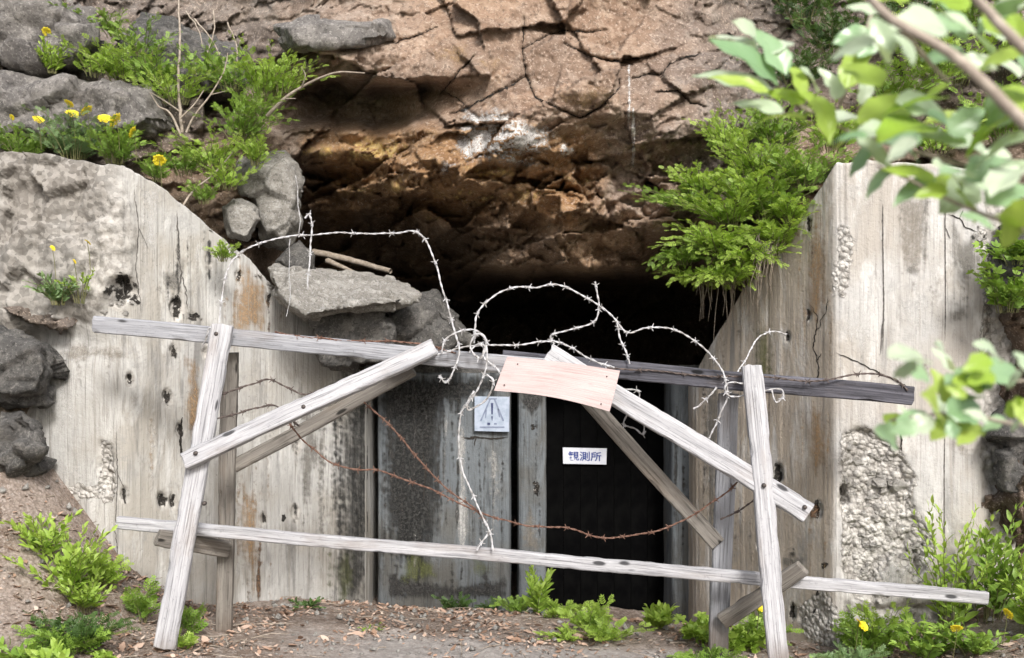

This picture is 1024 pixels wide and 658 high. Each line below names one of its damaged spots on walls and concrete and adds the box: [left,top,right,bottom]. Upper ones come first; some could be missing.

spalling [100,272,140,315]
rust [233,271,270,330]
crack [810,212,899,383]
spalling [68,439,126,504]
leakage [282,402,368,537]
leakage [382,377,499,543]
spalling [839,427,937,584]
leakage [338,550,365,600]
leakage [389,554,506,599]
spalling [853,594,890,605]